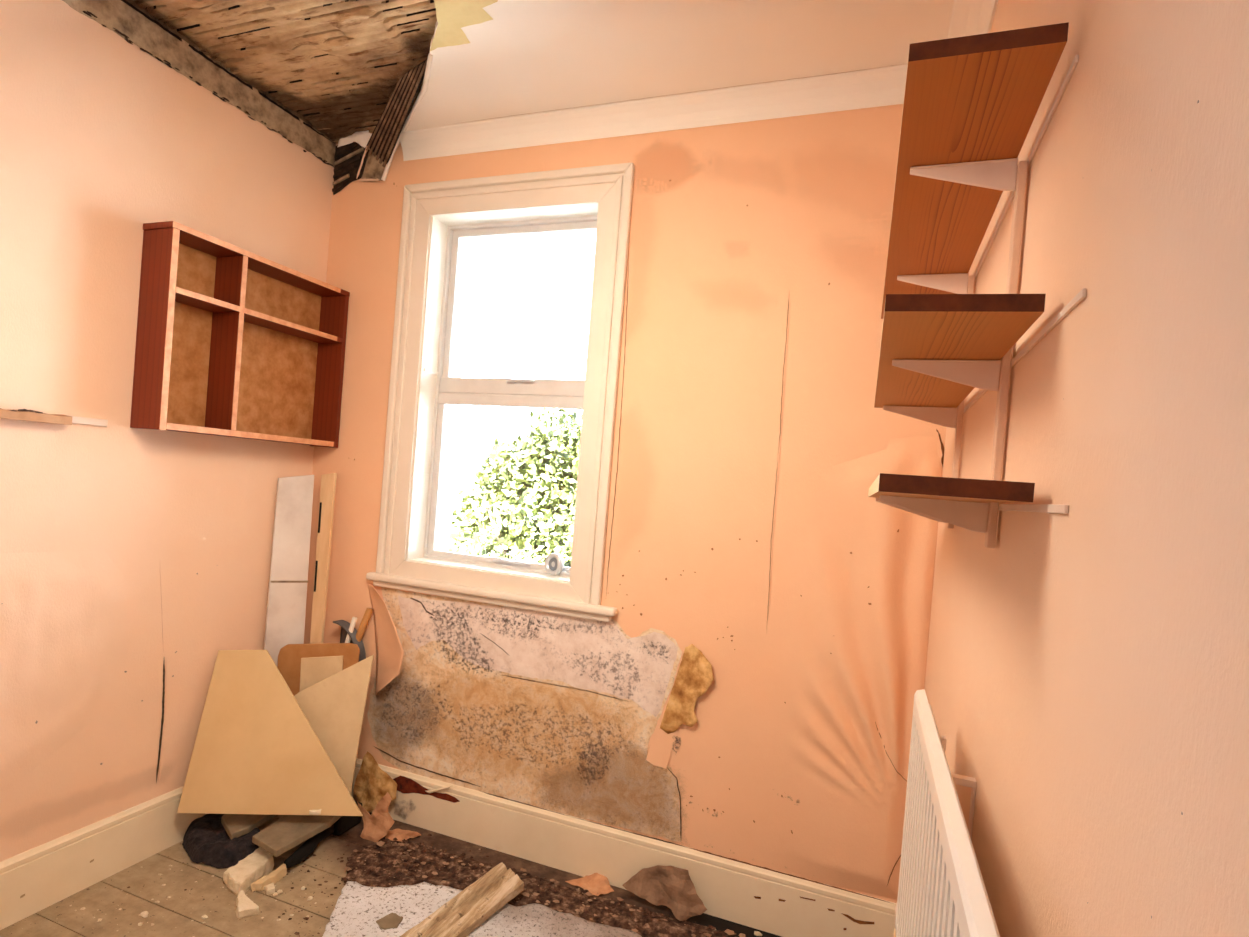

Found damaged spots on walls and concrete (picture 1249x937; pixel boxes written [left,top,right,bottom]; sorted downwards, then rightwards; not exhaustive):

spalling [83,11,333,166]
peeling [367,584,714,842]